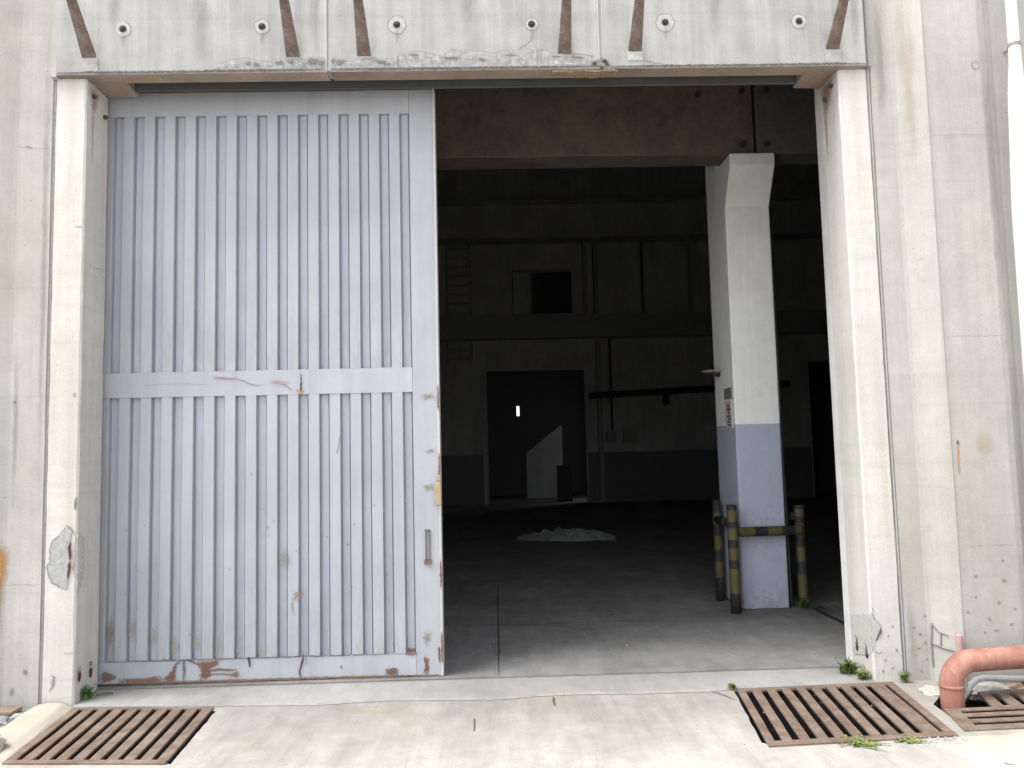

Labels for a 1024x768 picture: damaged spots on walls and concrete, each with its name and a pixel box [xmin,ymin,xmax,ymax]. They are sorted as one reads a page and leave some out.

spalling [201,45,619,79]
spalling [46,525,84,594]
corrosion [98,632,443,685]
spalling [851,608,894,672]